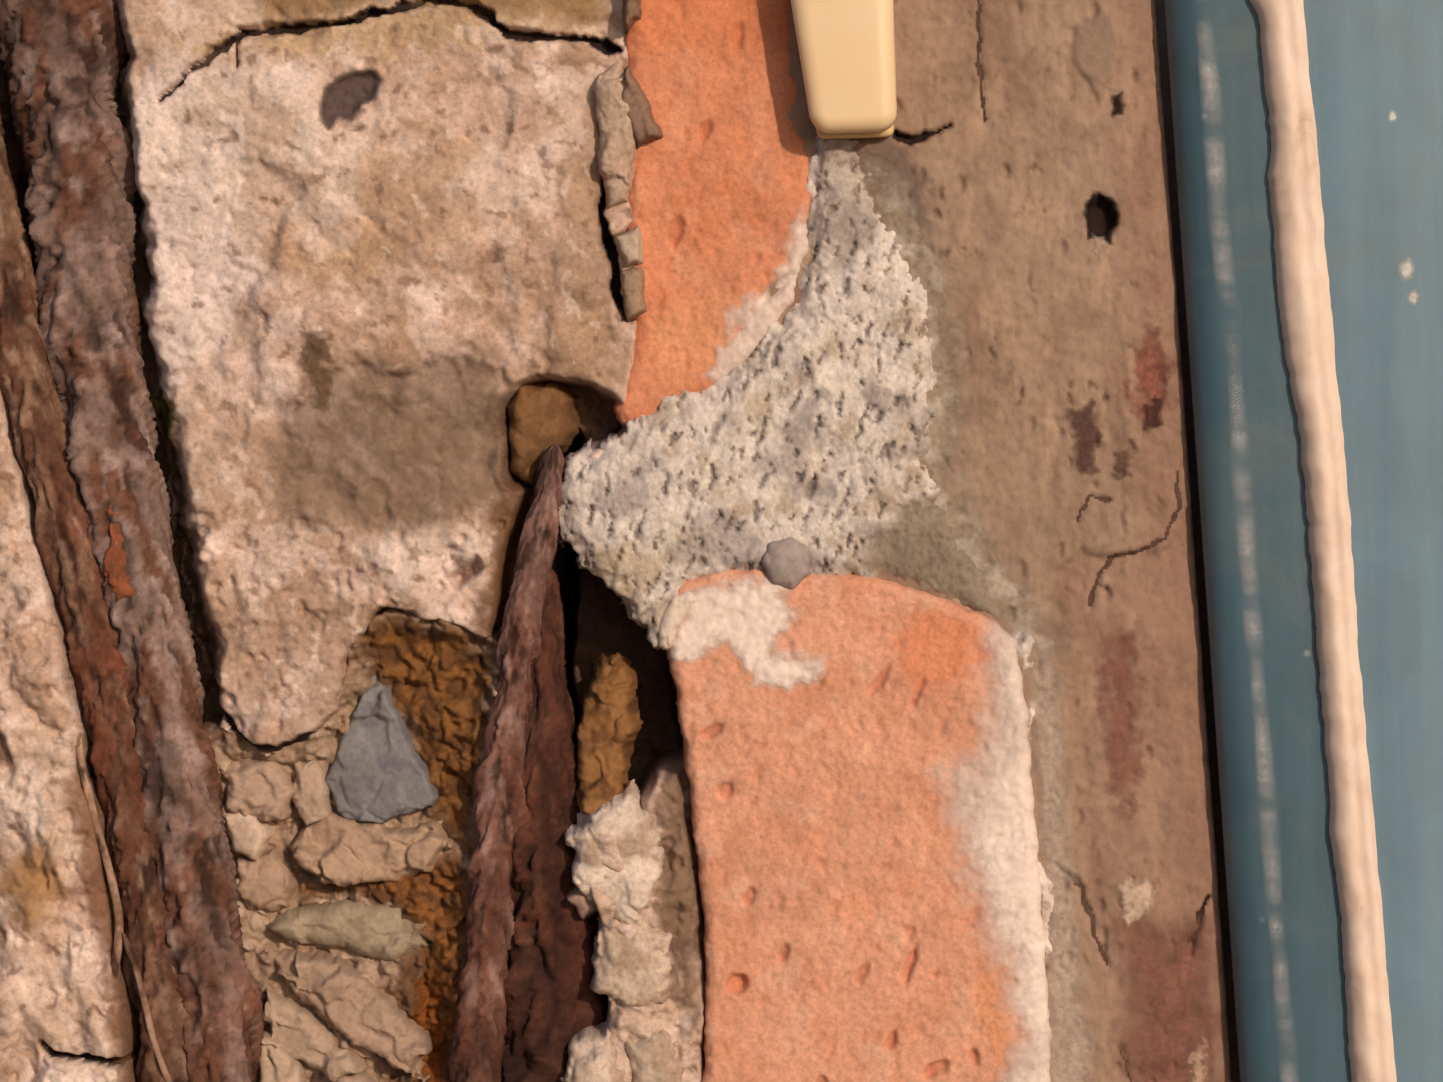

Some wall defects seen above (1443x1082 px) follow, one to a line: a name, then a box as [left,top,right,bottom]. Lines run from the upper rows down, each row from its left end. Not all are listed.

crack [159,0,623,102]
spalling [595,61,663,209]
crack [598,184,624,313]
spalling [613,225,647,322]
spalling [0,0,606,1082]
efflorescence [671,577,824,690]
rust [302,391,535,1082]
rust [9,850,59,919]
rust [72,736,142,1082]
damp [660,771,704,990]
damp [956,627,1091,1082]
crack [42,1040,131,1065]